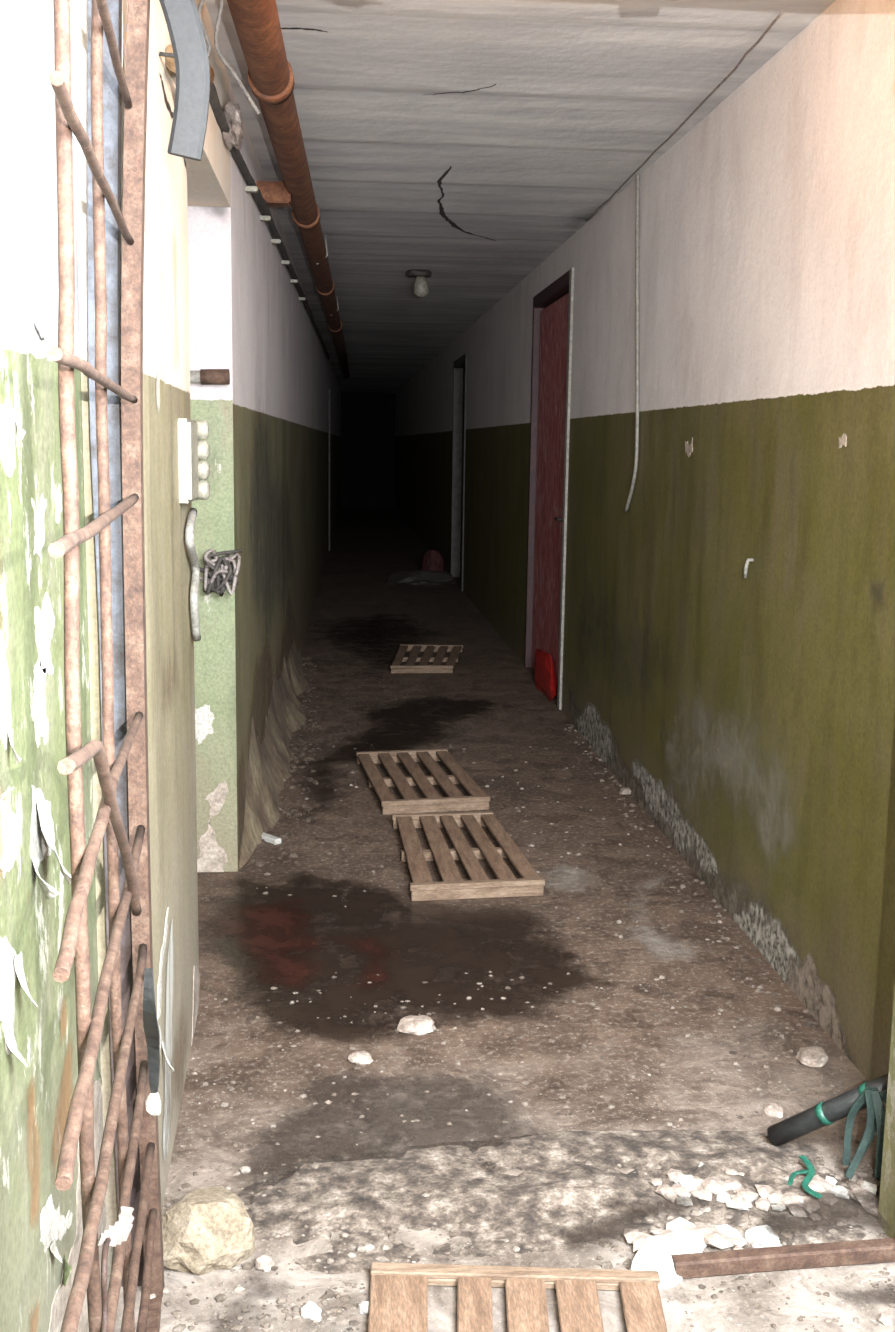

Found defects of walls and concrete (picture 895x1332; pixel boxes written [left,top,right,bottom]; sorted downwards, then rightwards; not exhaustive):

crack [437,166,495,241]
peeling [0,395,26,477]
peeling [32,479,62,557]
peeling [0,630,21,764]
peeling [32,592,55,748]
spalling [195,705,215,744]
peeling [0,784,71,899]
spalling [197,781,229,872]
peeling [0,936,38,1066]
peeling [157,907,175,1072]
water stain [212,873,598,1042]
peeling [40,1079,106,1332]